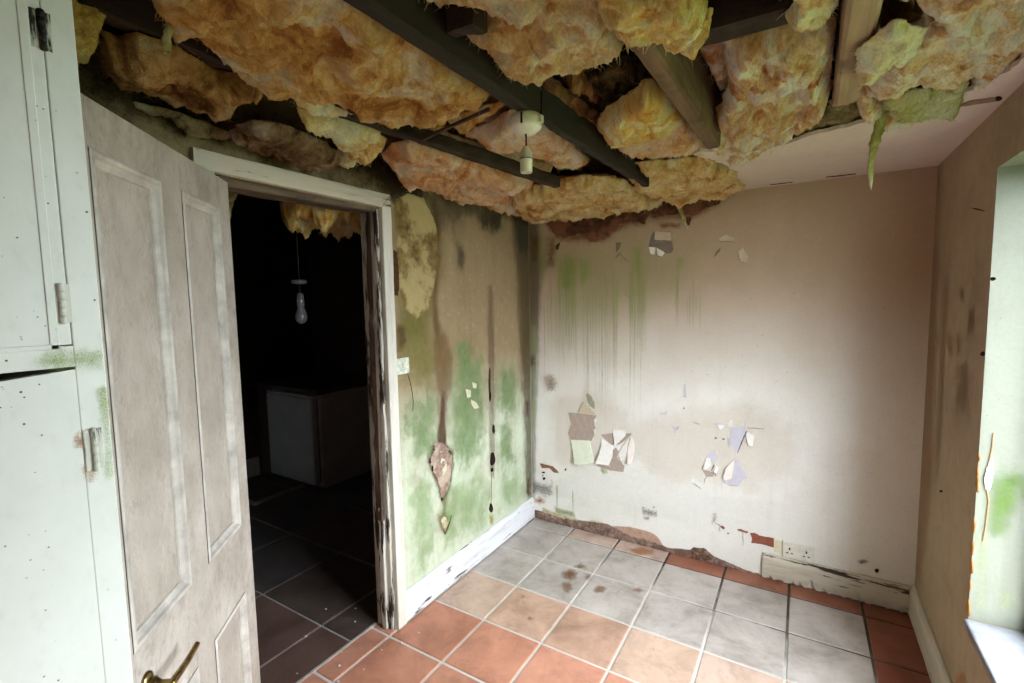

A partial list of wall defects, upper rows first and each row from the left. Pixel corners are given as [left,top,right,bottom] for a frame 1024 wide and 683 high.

peeling [961,96,1002,107]
peeling [545,199,721,257]
peeling [392,187,446,353]
leakage [395,192,808,576]
spalling [426,440,454,534]
peeling [540,402,634,480]
peeling [703,458,734,481]
spalling [535,507,760,575]
flaking render [750,533,783,555]